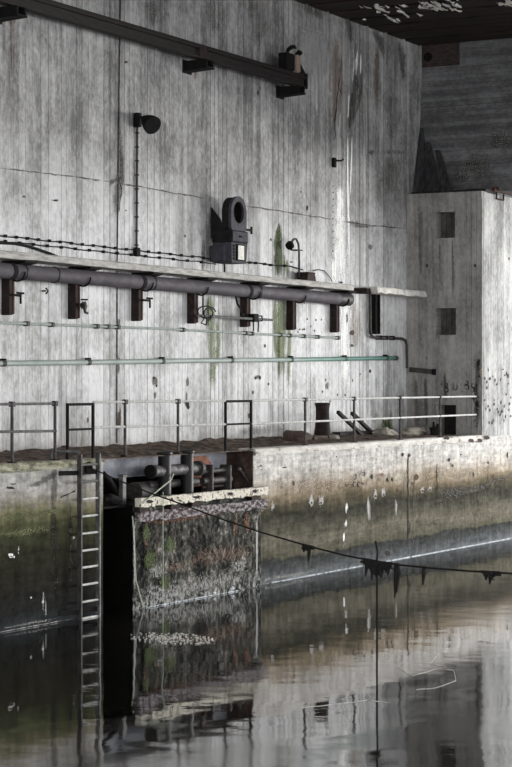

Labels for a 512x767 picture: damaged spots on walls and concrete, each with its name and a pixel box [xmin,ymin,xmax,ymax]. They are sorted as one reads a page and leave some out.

peeling [360,0,462,23]